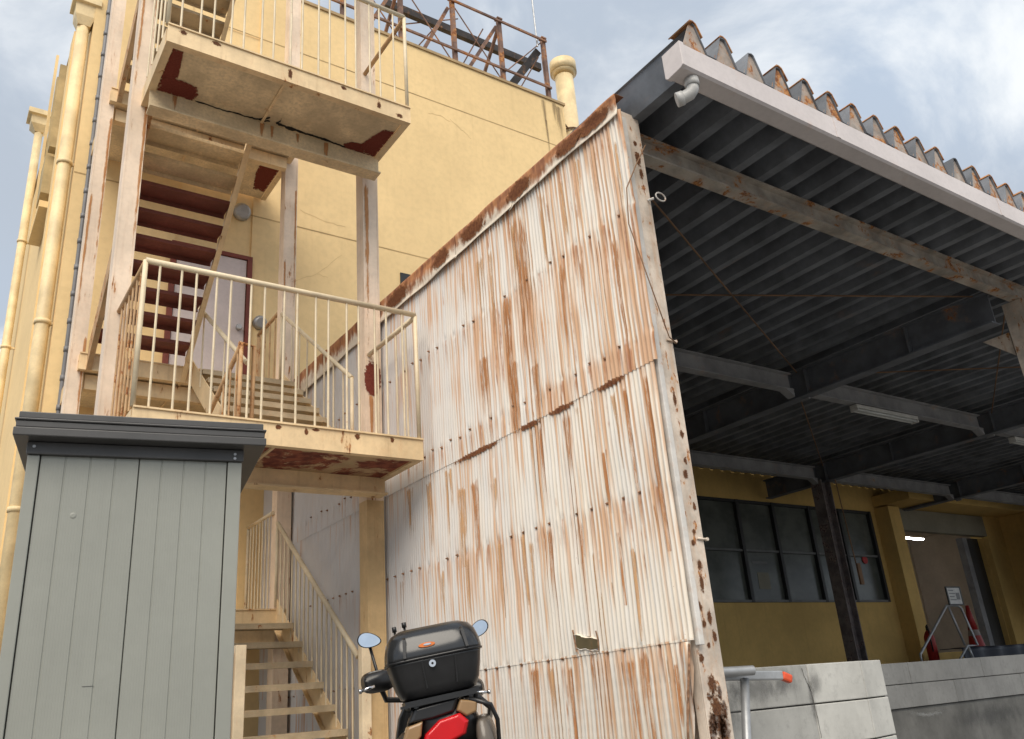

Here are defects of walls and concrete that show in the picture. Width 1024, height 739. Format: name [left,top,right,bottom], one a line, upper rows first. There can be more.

corrosion [668,19,733,54]
corrosion [157,48,198,109]
crack [196,101,346,148]
corrosion [344,130,394,157]
corrosion [555,103,612,190]
corrosion [253,165,279,192]
corrosion [506,174,531,203]
corrosion [458,215,486,243]
corrosion [355,362,381,440]
corrosion [476,220,657,739]
corrosion [643,378,671,551]
corrosion [445,439,502,608]